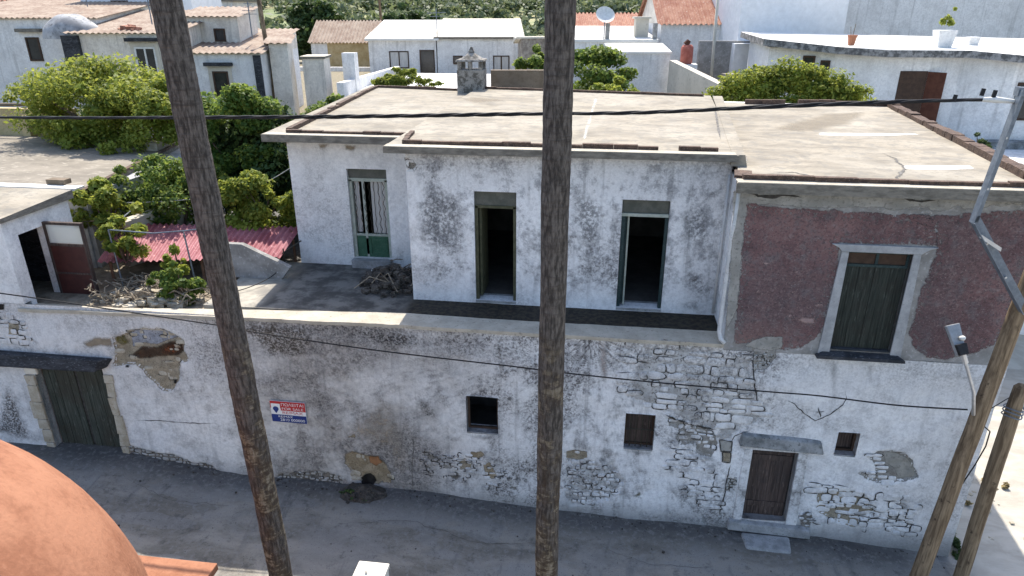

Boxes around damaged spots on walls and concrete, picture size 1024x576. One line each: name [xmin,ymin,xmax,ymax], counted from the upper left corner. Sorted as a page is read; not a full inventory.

crack [753,172,808,199]
crack [889,156,935,202]
flaking render [112,328,189,391]
flaking render [625,337,783,463]
crack [789,392,847,421]
flaking render [278,451,395,484]
flaking render [419,450,516,491]
flaking render [564,450,624,506]
flaking render [859,450,918,487]
flaking render [799,491,914,532]